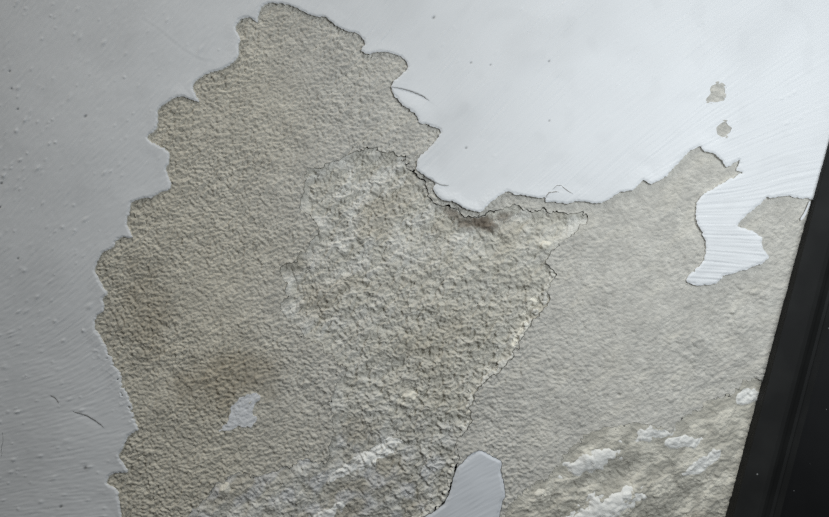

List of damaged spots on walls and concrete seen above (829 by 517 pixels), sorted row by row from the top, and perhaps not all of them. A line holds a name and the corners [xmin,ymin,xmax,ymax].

peeling [706,81,726,104]
peeling [716,120,731,138]
spalling [187,148,588,517]
spalling [505,378,762,517]